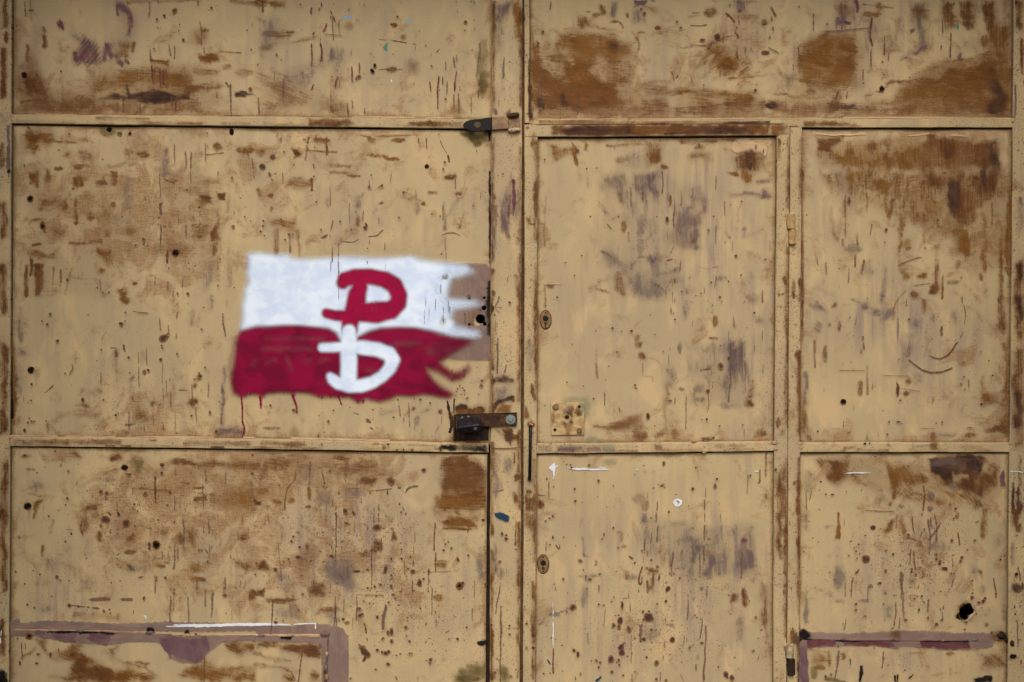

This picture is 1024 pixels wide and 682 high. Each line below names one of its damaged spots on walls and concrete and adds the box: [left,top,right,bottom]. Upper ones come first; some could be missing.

rust [0,0,252,155]
rust [521,0,1024,449]
rust [436,449,486,530]
rust [935,458,997,575]
rust [181,642,321,682]